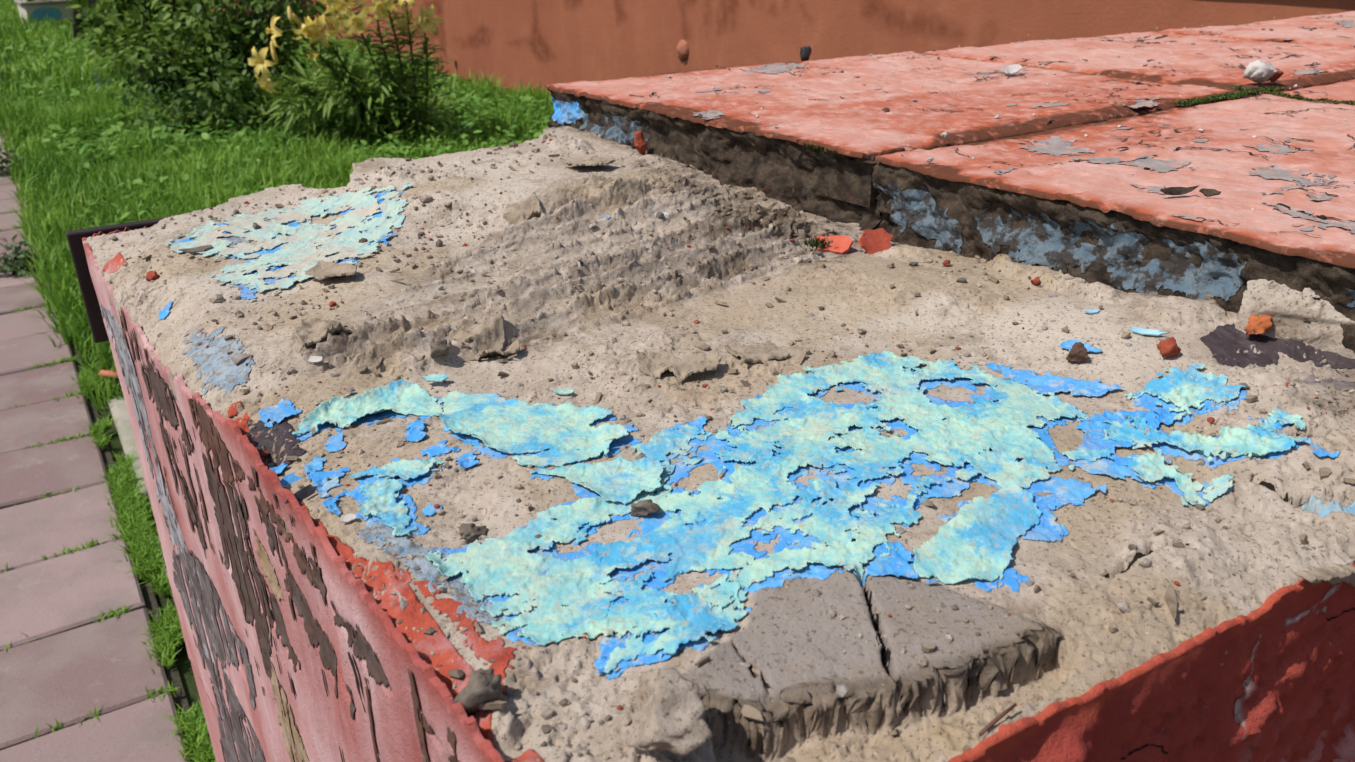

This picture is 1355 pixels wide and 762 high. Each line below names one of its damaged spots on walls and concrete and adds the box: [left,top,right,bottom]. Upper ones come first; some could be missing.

peeling [163,183,414,300]
spalling [502,193,543,225]
peeling [551,97,651,166]
peeling [868,31,1221,197]
peeling [873,183,1246,301]
peeling [1209,16,1355,118]
peeling [1241,129,1355,236]
peeling [100,301,1340,762]
flaking render [1294,563,1355,587]
peeling [1301,495,1355,517]
crack [862,575,903,702]
crack [1121,744,1169,760]